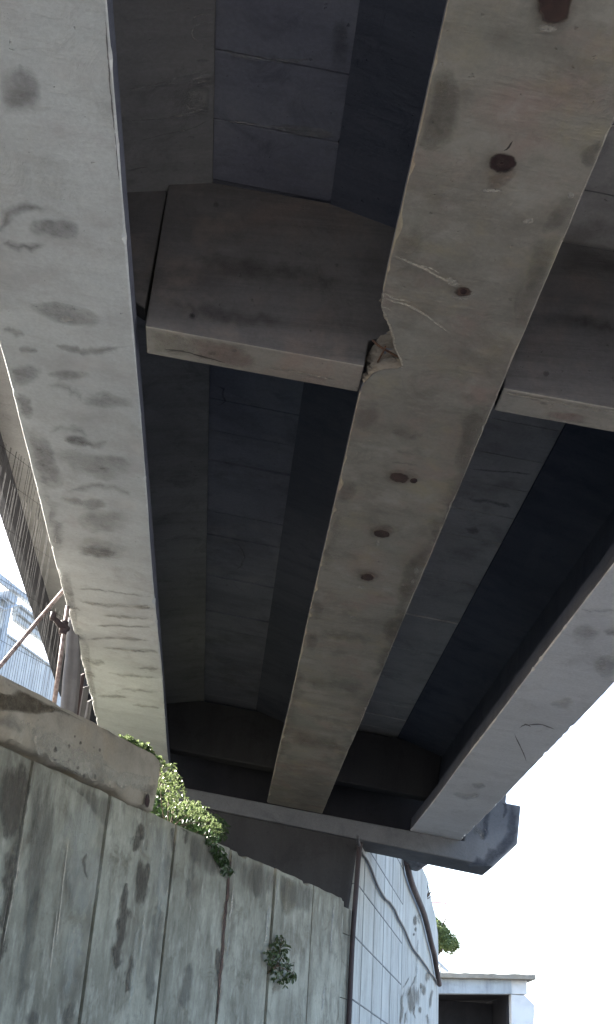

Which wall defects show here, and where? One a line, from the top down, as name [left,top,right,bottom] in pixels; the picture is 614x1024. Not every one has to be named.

rust [538,0,571,32]
rust [490,141,517,172]
crack [396,256,452,283]
rust [447,278,472,299]
crack [381,293,446,331]
spalling [361,292,404,383]
rust [390,473,417,483]
crack [515,724,553,759]
leakage [473,803,516,866]
leakage [0,764,49,960]
leakage [113,823,150,992]